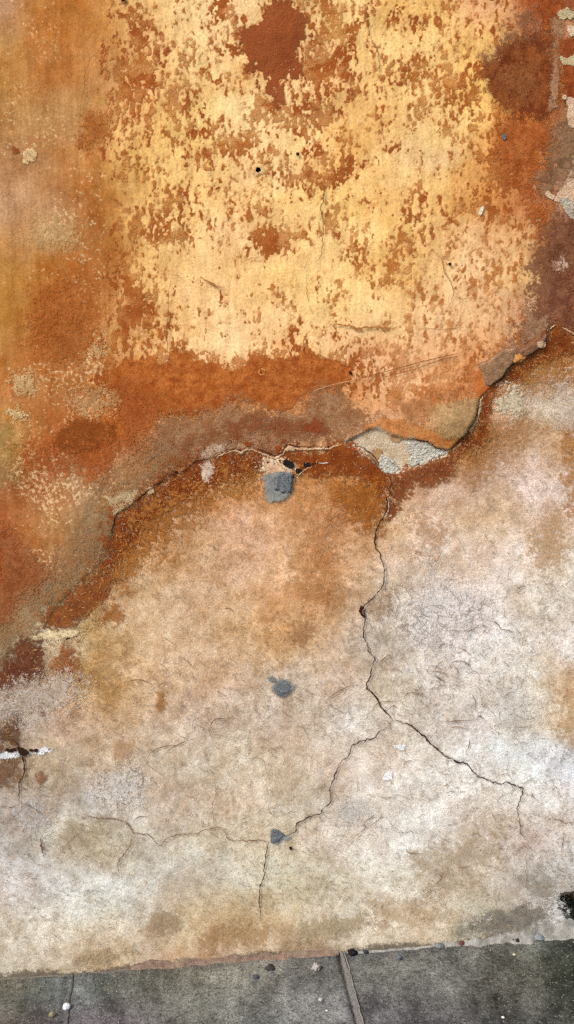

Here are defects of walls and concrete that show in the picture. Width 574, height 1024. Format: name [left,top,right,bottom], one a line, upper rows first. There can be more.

peeling [74,0,574,474]
crack [452,325,574,450]
crack [43,443,527,917]